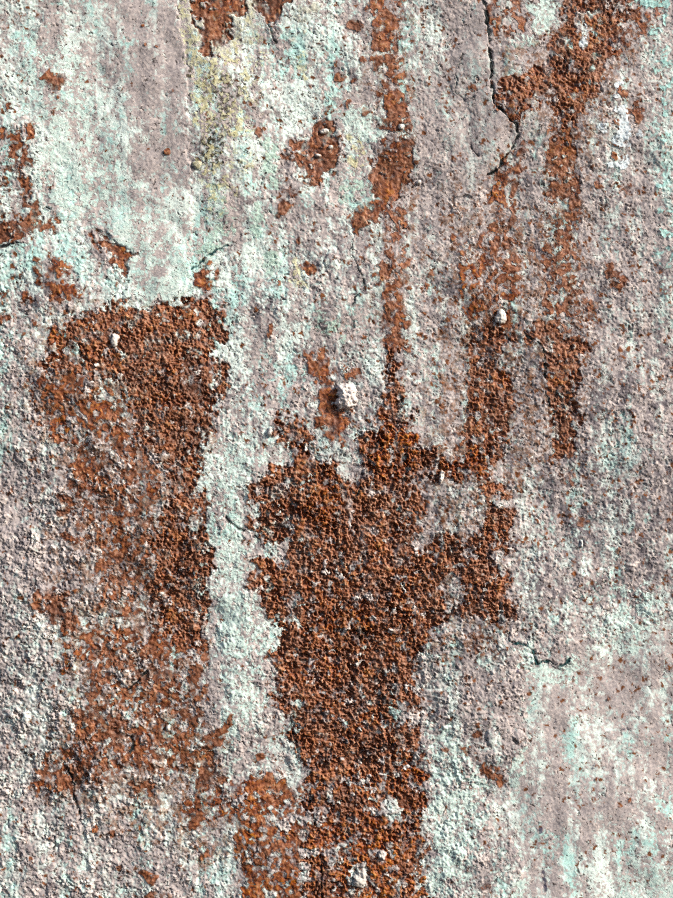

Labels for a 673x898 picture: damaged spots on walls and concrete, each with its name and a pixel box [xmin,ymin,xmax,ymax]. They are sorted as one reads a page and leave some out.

crack [455,0,519,175]
corrosion [0,289,12,326]
corrosion [0,121,61,244]
corrosion [491,0,662,461]
corrosion [22,0,529,898]